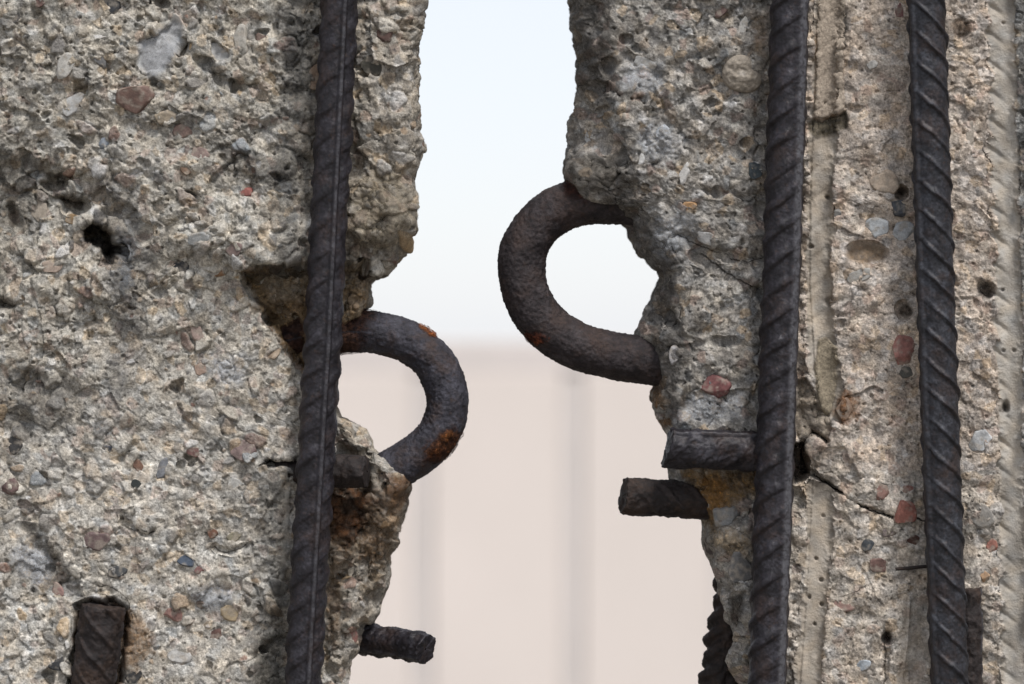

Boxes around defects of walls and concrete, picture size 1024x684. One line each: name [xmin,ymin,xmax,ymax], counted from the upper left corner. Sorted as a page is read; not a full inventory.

rust [247,278,307,366]
spalling [246,0,371,684]
rust [340,308,371,356]
rust [524,333,545,347]
spalling [618,0,848,684]
rust [330,477,408,555]
rust [423,430,464,464]
crack [800,432,890,516]
spalling [70,598,128,684]
spalling [358,623,436,664]